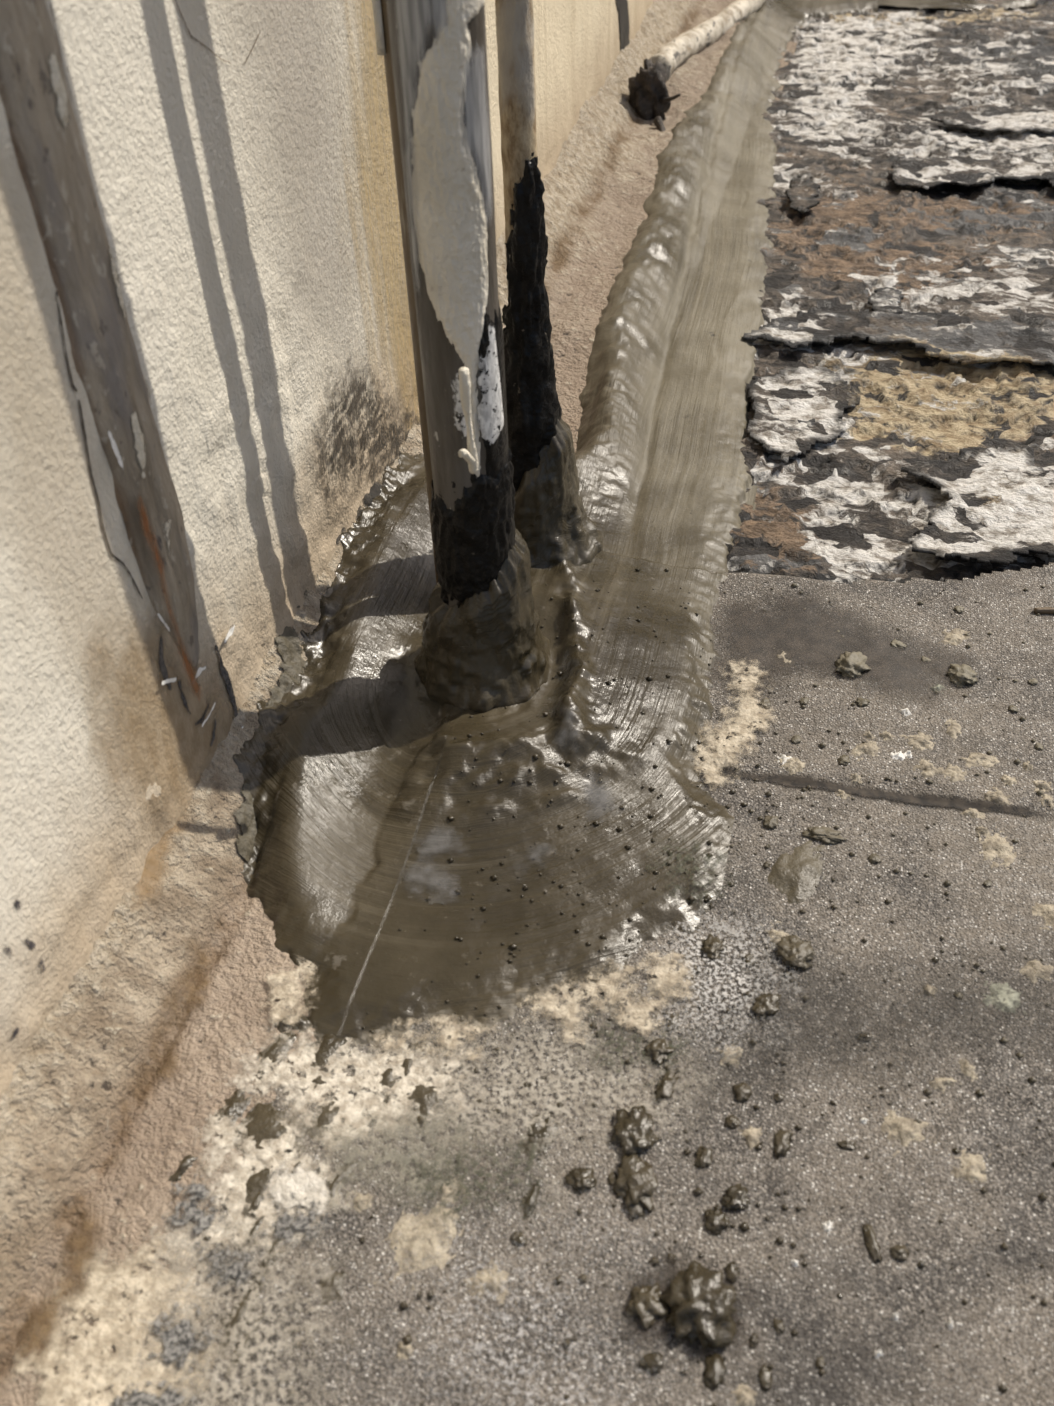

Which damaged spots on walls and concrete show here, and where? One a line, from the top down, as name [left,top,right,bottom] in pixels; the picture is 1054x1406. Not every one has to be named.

damp [616,0,630,50]
damp [363,0,414,379]
damp [315,360,419,544]
damp [233,783,257,866]
damp [411,831,453,887]